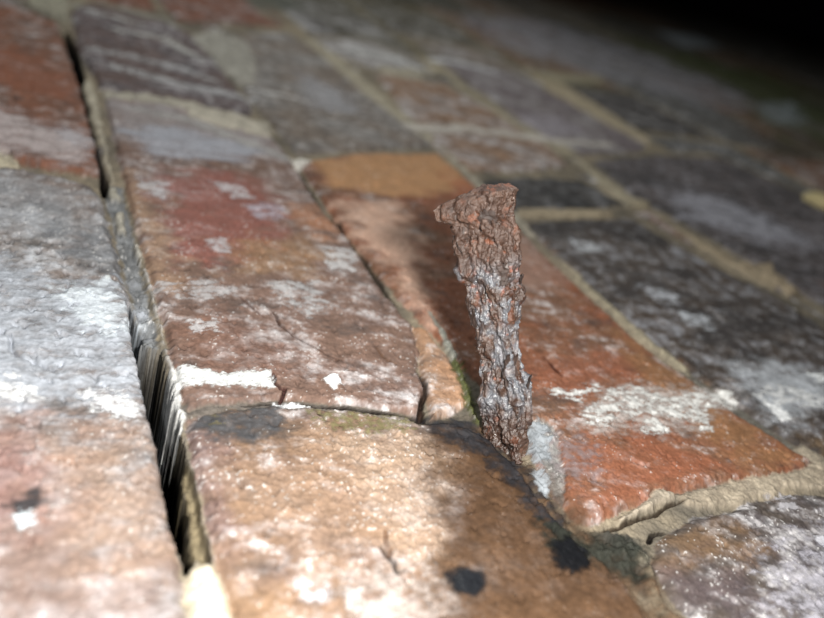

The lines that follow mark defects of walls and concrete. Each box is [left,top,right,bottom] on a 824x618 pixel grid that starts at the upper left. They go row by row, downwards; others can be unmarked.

damp [0,267,147,418]
crack [240,297,343,362]
crack [244,371,429,424]
crack [374,347,397,365]
corrosion [503,351,518,388]
damp [550,383,739,434]
damp [740,361,824,422]
damp [345,418,677,618]
damp [296,581,329,601]